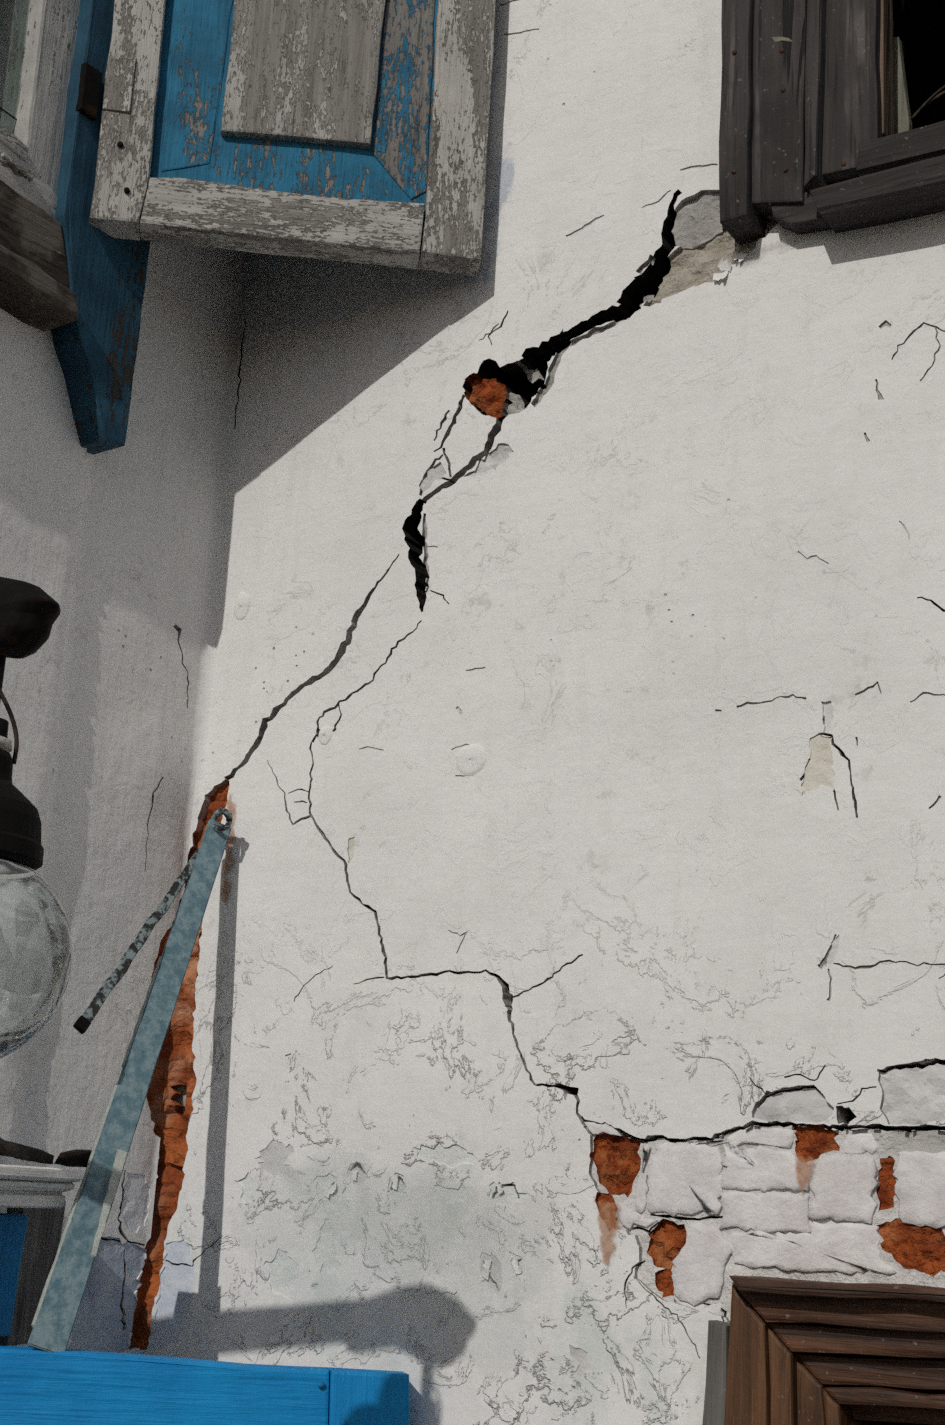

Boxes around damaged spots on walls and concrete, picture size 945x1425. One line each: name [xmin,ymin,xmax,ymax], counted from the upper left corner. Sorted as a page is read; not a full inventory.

flaking render [643,190,779,306]
crack [875,320,945,400]
crack [798,551,829,564]
crack [917,597,945,612]
crack [855,681,945,703]
crack [101,163,718,1350]
crack [715,694,858,818]
peeling [801,701,835,796]
crack [818,934,945,1001]
peeling [68,1149,151,1353]
peeling [151,1240,195,1347]
flaking render [583,1058,945,1359]